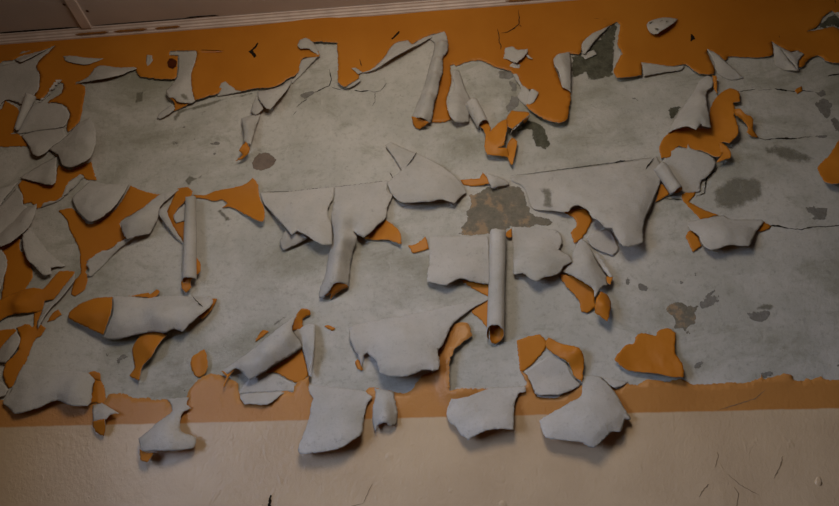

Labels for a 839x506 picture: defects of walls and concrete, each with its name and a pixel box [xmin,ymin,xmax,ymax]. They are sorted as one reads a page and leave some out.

peeling [647,17,677,34]
peeling [157,51,197,119]
peeling [236,38,321,161]
peeling [0,49,137,289]
peeling [68,177,217,380]
peeling [261,24,758,378]
peeling [686,215,771,252]
peeling [817,141,839,184]
peeling [0,365,119,436]
peeling [139,390,196,463]
peeling [221,308,398,454]
peeling [446,356,631,448]